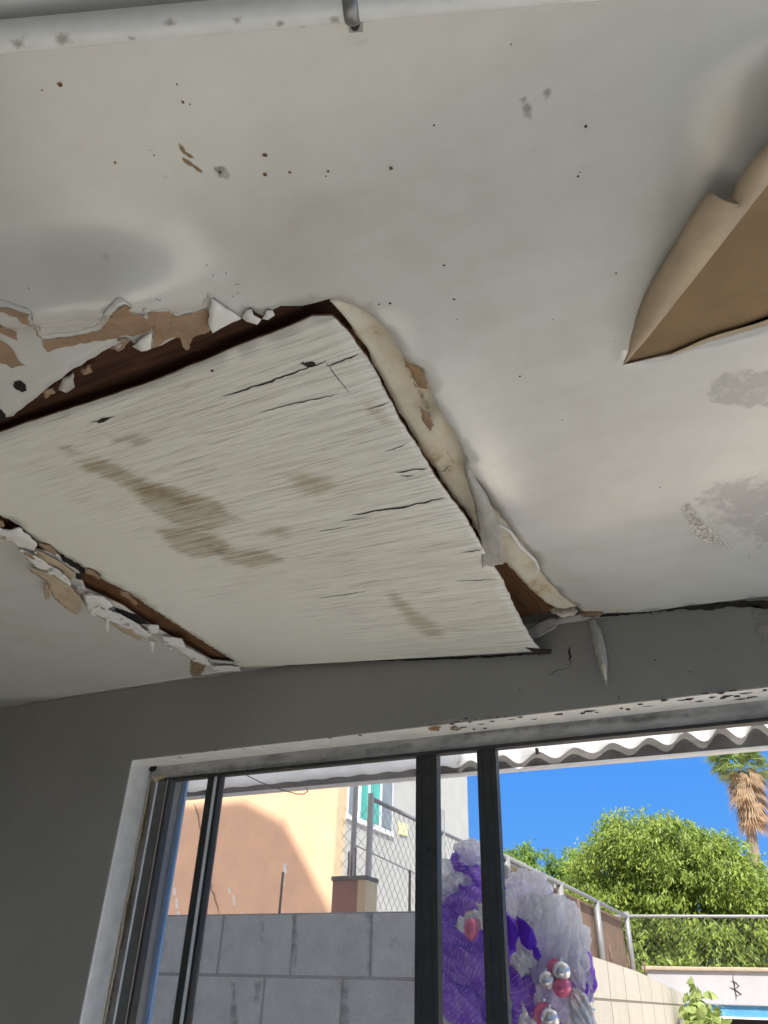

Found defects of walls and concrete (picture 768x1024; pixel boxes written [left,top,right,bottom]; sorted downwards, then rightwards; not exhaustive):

peeling [623,143,768,365]
peeling [0,293,275,368]
hole [13,381,27,392]
crack [225,354,359,412]
crack [386,444,452,477]
crack [322,497,445,531]
flaking render [0,527,71,586]
flaking render [84,594,241,672]